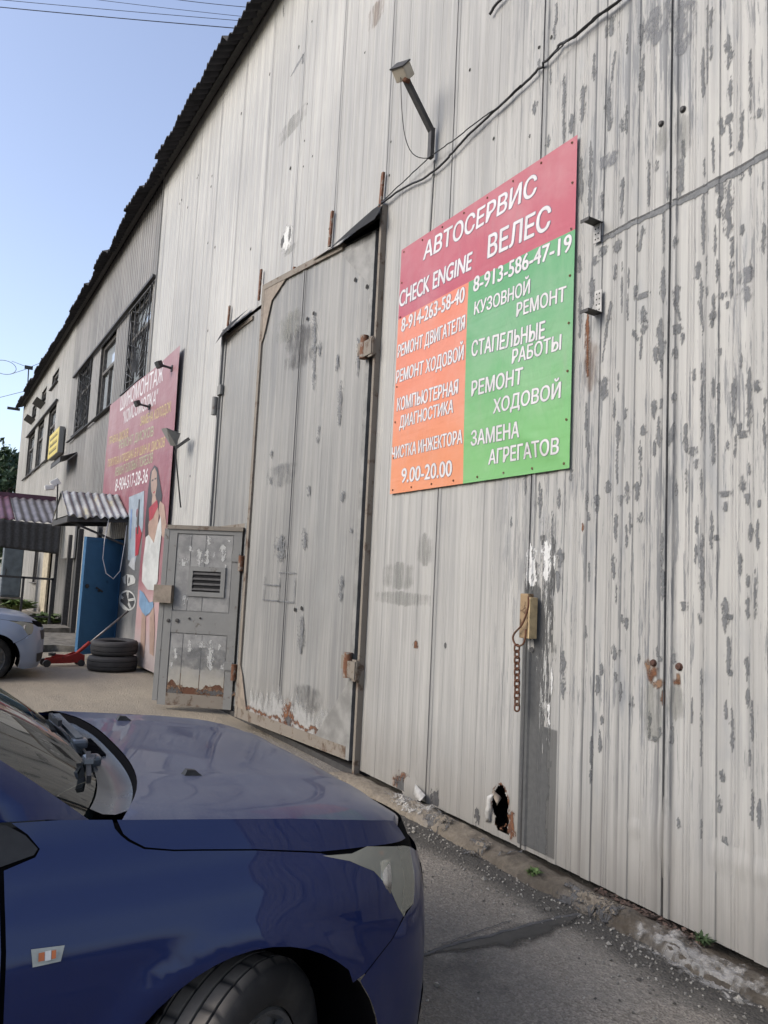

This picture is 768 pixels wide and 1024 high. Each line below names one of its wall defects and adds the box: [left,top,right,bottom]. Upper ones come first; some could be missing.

peeling [585,355,767,550]
peeling [694,463,761,623]
peeling [170,640,224,671]
corrosion [166,684,235,697]
corrosion [246,702,318,734]
peeling [517,474,566,855]
peeling [595,646,633,706]
corrosion [645,660,680,705]
peeling [691,669,703,766]
peeling [721,597,733,676]
peeling [724,700,735,752]
peeling [744,657,754,766]